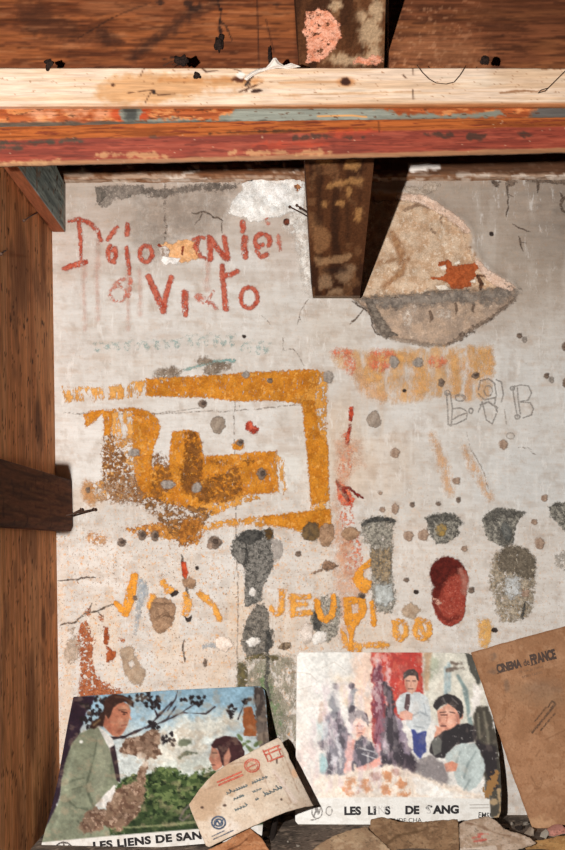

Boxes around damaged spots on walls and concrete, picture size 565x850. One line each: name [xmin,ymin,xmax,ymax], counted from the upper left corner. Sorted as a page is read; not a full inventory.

spalling [353,182,517,347]